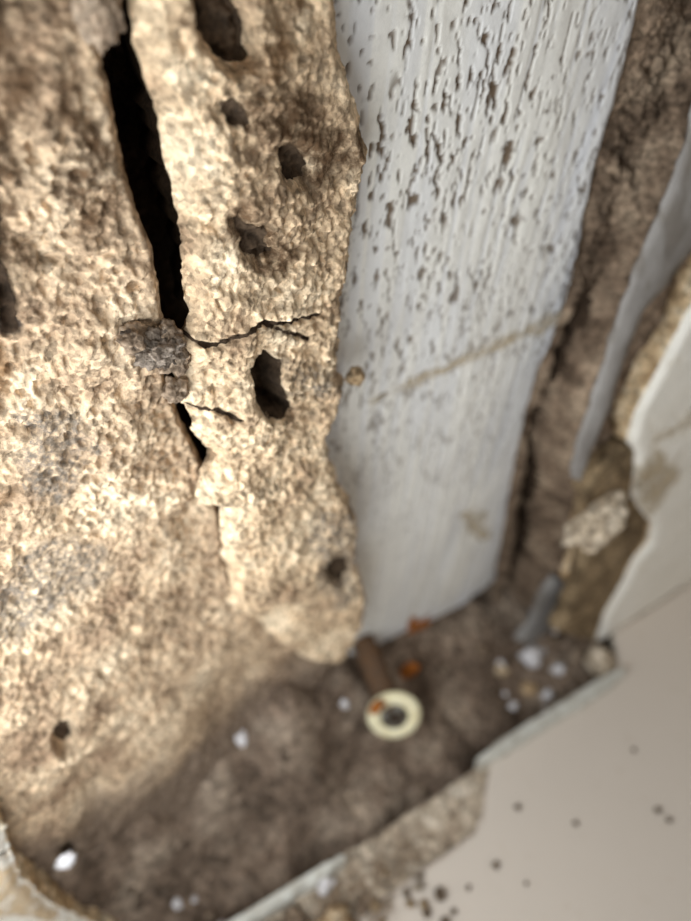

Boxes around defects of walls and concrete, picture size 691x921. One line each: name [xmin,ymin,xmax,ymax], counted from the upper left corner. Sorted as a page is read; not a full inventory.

crack [119,0,320,349]
crack [0,216,23,333]
spalling [0,0,359,874]
crack [199,440,208,457]
crack [185,402,243,422]
spalling [344,366,366,387]
spalling [491,0,691,640]